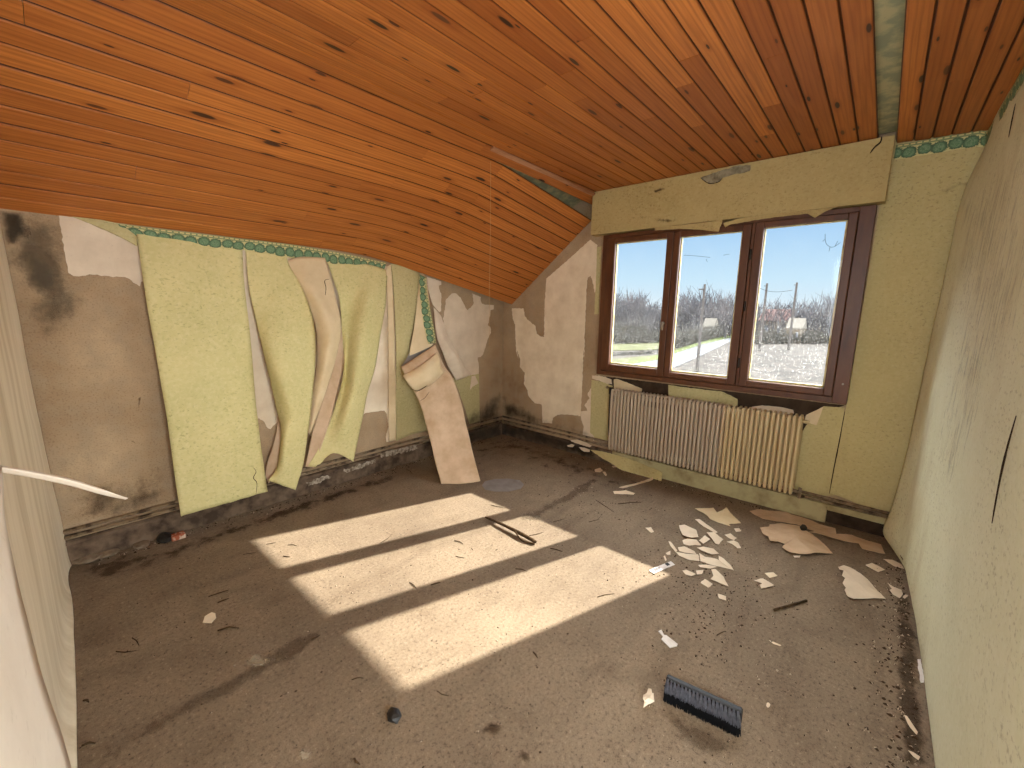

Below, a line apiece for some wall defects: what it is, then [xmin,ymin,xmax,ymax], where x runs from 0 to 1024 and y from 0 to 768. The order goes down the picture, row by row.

peeling [701,165,751,184]
water stain [5,214,61,318]
water stain [468,404,593,456]
peeling [306,475,331,486]
peeling [344,445,418,473]
crack [992,416,1017,523]